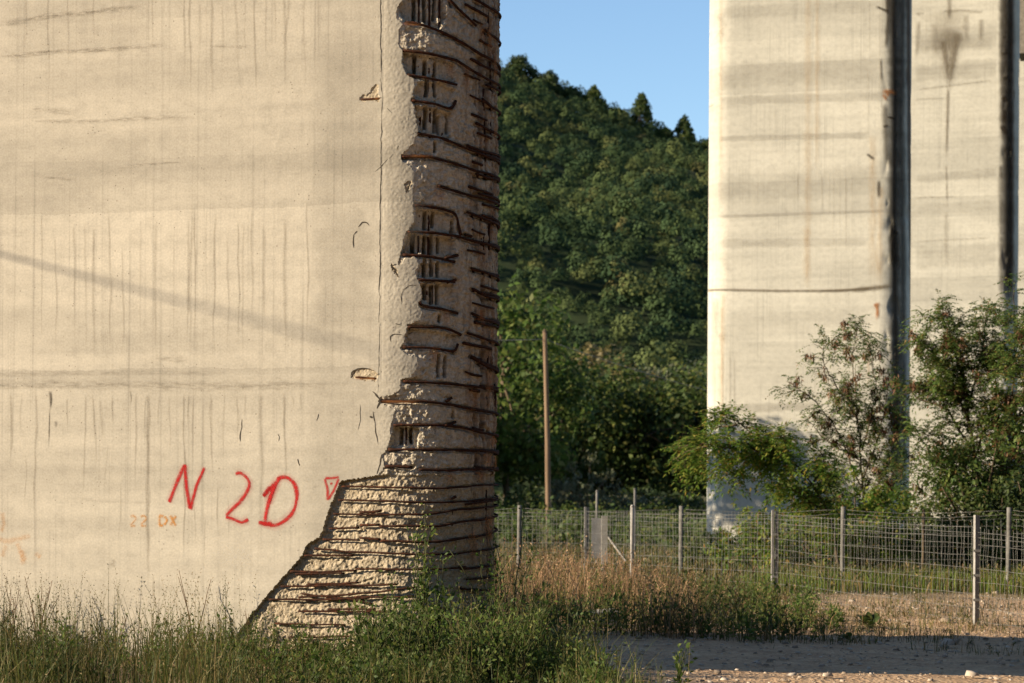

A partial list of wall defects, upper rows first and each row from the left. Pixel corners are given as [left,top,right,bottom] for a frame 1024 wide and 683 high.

spalling [231,0,502,661]